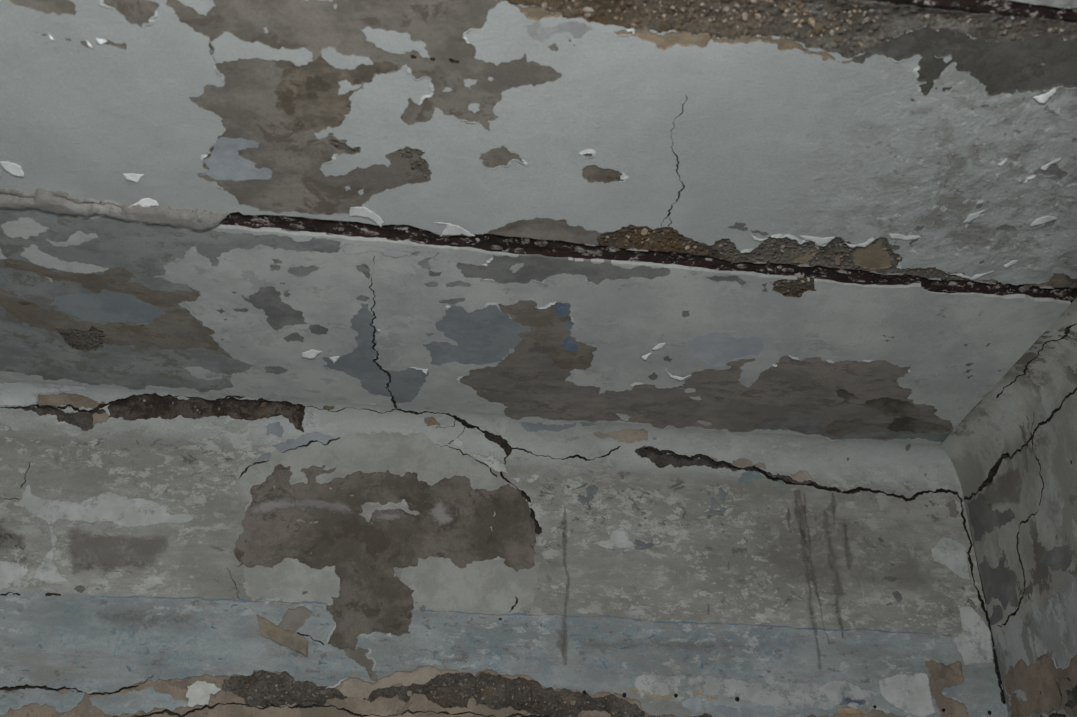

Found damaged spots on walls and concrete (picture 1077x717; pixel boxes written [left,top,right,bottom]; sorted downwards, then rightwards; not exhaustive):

peeling [9,0,77,15]
peeling [37,33,127,50]
peeling [99,0,1077,227]
peeling [0,161,24,177]
crack [661,96,688,227]
peeling [0,208,1018,491]
crack [0,256,1077,703]
peeling [0,416,712,717]
water stain [593,527,635,549]
crack [0,675,548,717]
flaking render [925,659,969,717]
peeling [1004,651,1077,717]